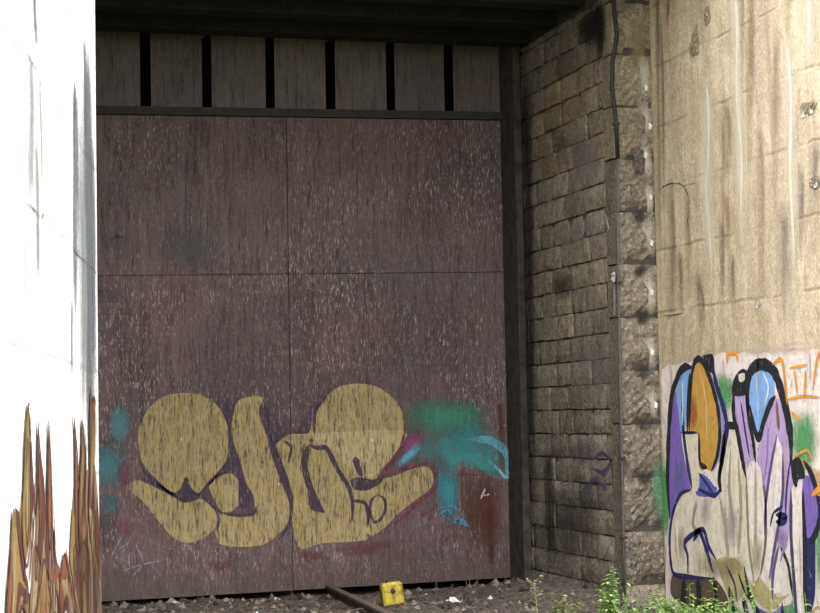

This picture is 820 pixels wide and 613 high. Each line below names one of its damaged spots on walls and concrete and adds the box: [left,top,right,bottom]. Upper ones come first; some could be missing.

damp [71,45,96,430]
spalling [690,6,711,56]
damp [697,87,712,270]
damp [731,0,744,238]
damp [786,44,795,267]
spalling [800,102,816,118]